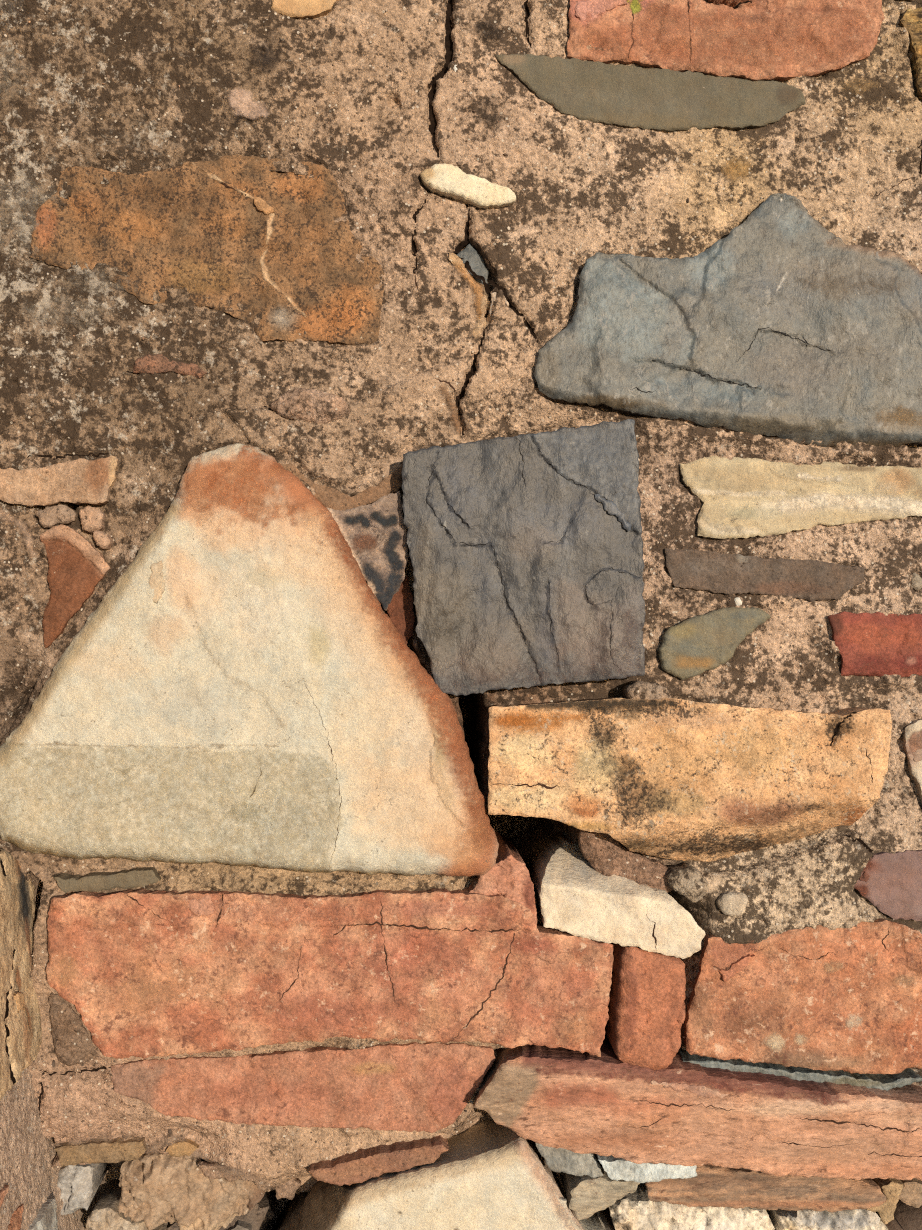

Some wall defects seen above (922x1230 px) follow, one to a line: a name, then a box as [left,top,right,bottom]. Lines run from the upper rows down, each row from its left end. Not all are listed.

crack [427,0,453,158]
crack [523,0,531,48]
crack [411,191,430,304]
crack [438,204,538,436]
crack [333,904,529,1038]